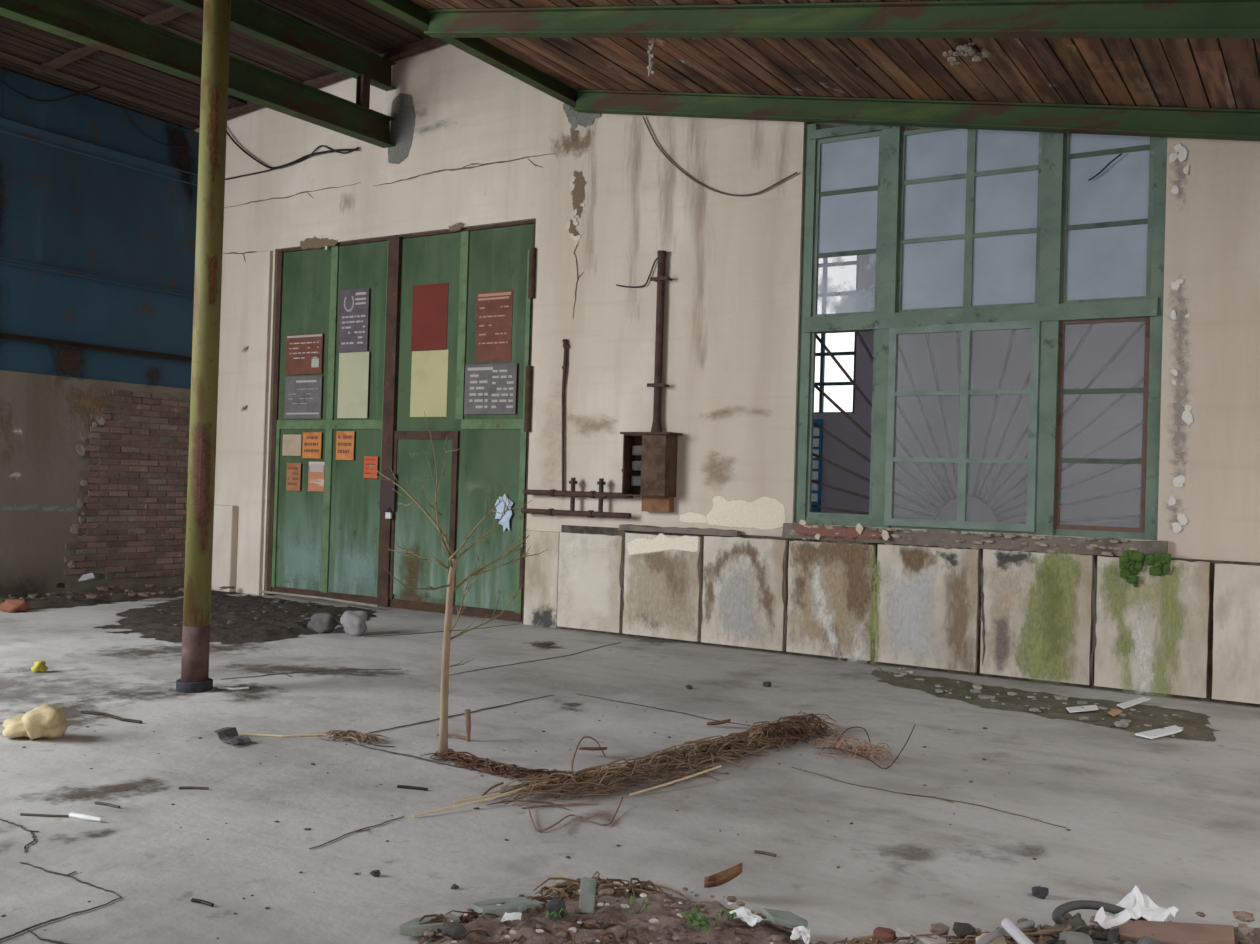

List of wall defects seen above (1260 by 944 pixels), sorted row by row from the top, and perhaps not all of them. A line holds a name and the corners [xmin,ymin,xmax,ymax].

corrosion [167,127,195,201]
corrosion [207,86,220,179]
crack [226,154,548,208]
peeling [565,171,586,246]
corrosion [205,257,217,304]
spalling [0,389,190,626]
corrosion [193,425,209,550]
water stain [629,544,772,644]
water stain [792,538,971,669]
water stain [1111,572,1164,691]